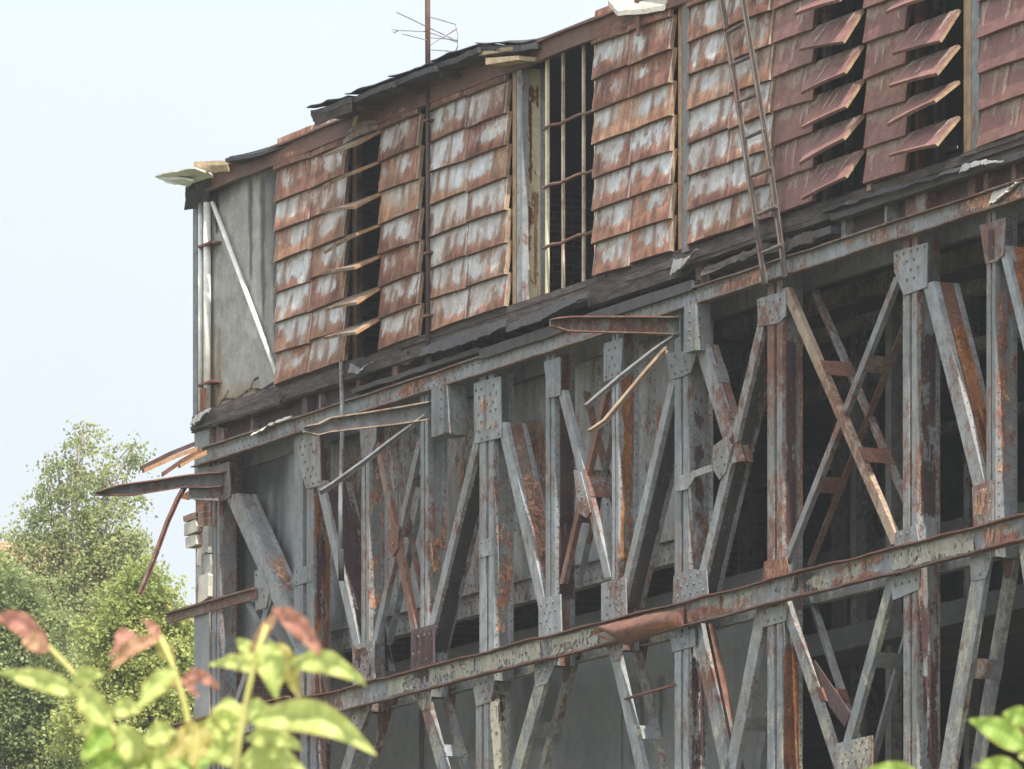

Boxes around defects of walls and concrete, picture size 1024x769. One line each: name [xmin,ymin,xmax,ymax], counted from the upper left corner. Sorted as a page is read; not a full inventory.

rust [528,86,539,296]
rust [314,453,384,675]
rust [496,408,575,633]
rust [620,373,634,577]
rust [920,332,937,517]
rust [953,260,1024,476]
rust [783,644,799,769]